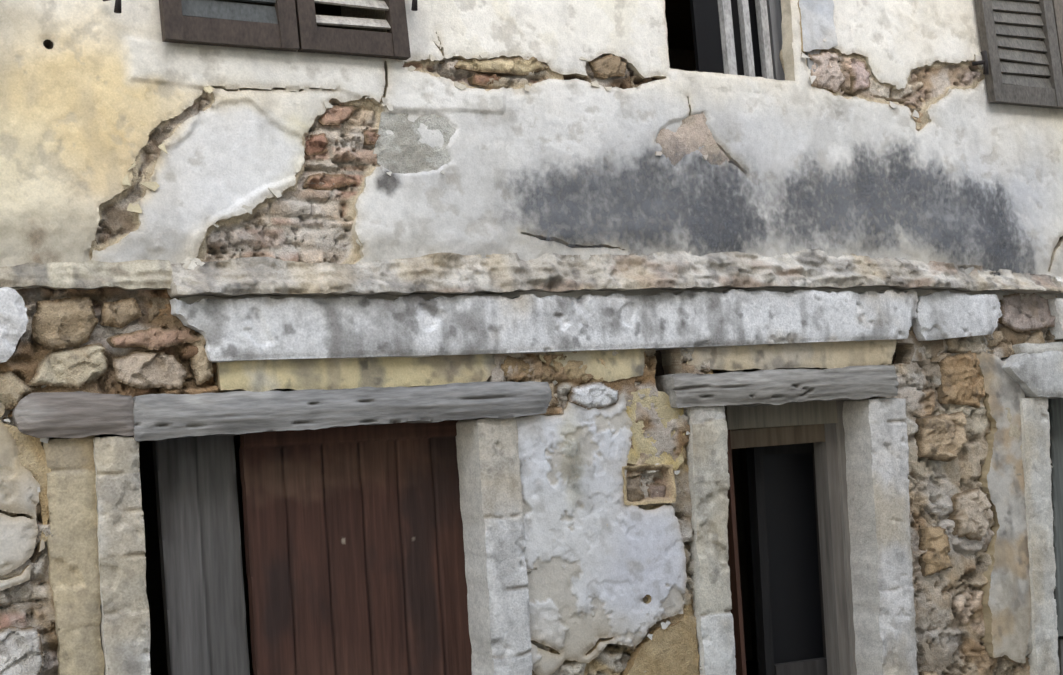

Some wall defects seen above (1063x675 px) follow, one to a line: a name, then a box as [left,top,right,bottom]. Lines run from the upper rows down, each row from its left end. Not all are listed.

spalling [89,85,217,259]
spalling [187,78,456,270]
spalling [395,49,660,91]
leakage [517,147,764,255]
spalling [801,39,985,131]
spalling [485,347,713,675]